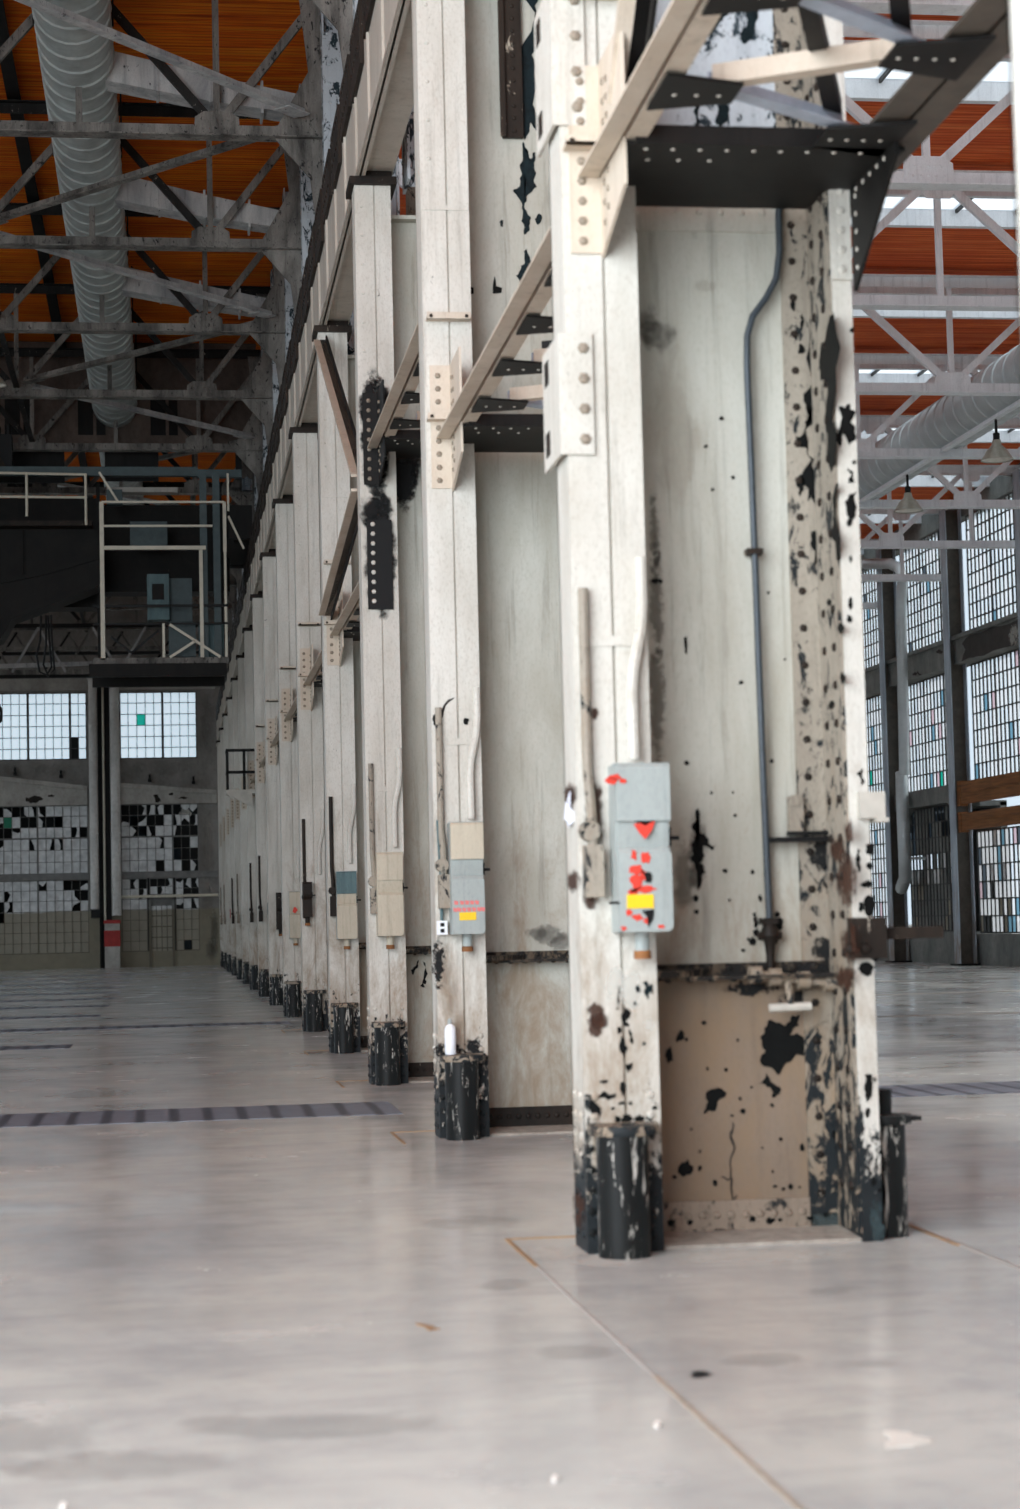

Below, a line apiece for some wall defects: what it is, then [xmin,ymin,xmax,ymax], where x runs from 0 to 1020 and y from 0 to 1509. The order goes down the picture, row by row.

peeling [710,11,758,44]
peeling [513,0,542,283]
peeling [693,104,729,126]
peeling [790,301,856,570]
peeling [827,597,853,634]
peeling [691,808,728,914]
peeling [703,1015,805,1117]
peeling [672,1150,718,1186]